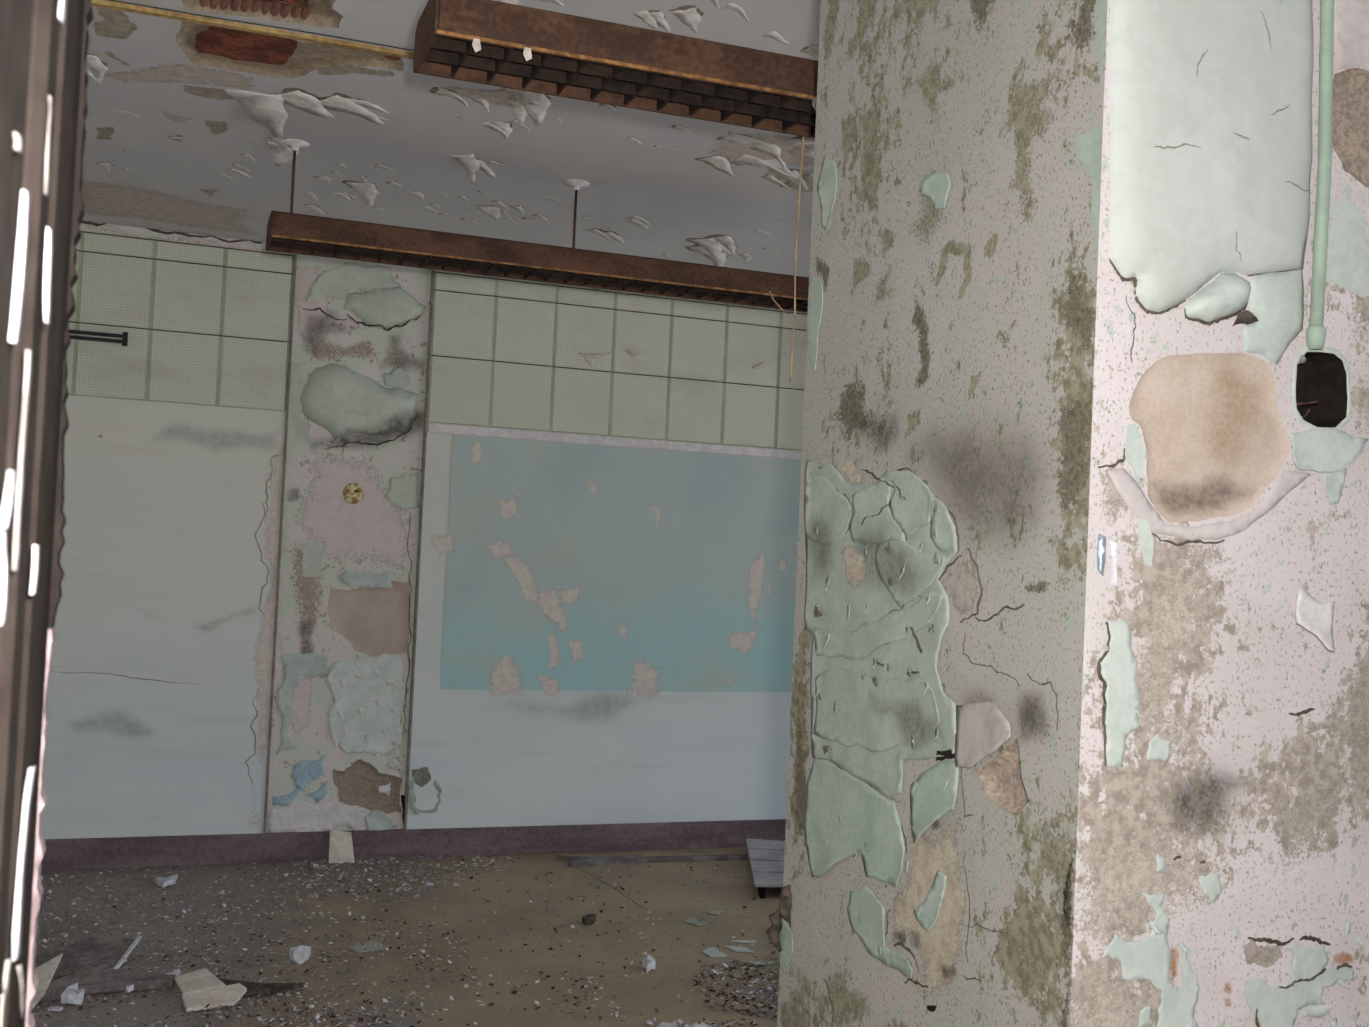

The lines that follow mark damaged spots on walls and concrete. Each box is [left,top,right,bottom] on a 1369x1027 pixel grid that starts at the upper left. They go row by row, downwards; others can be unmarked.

peeling [303,154,560,226]
peeling [429,86,561,139]
spalling [0,0,401,1027]
peeling [247,339,442,833]
spalling [483,539,585,697]
peeling [832,376,885,440]
peeling [794,460,1029,996]
crack [835,467,1059,731]
peeling [999,0,1369,763]
peeling [724,885,793,971]
peeling [1037,790,1222,1027]
peeling [1237,931,1354,1027]